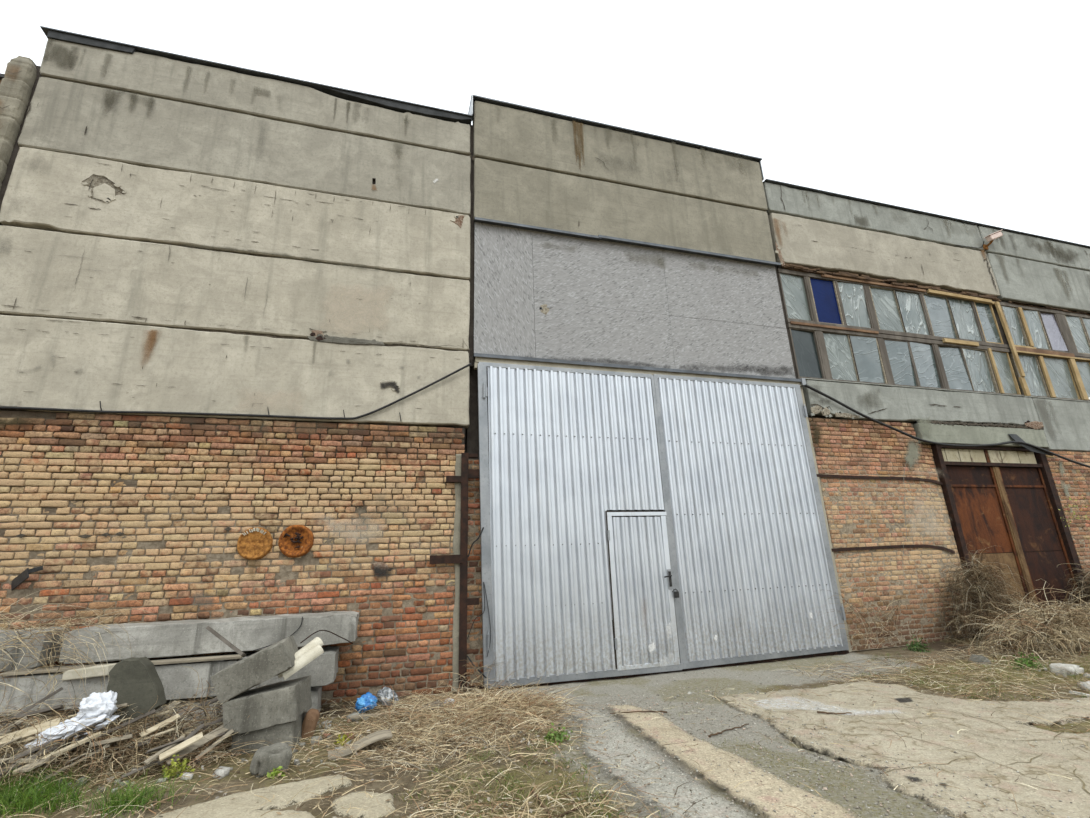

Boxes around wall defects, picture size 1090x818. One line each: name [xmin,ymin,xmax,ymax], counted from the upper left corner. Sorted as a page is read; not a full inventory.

spalling [64,162,134,217]
corrosion [146,331,156,356]